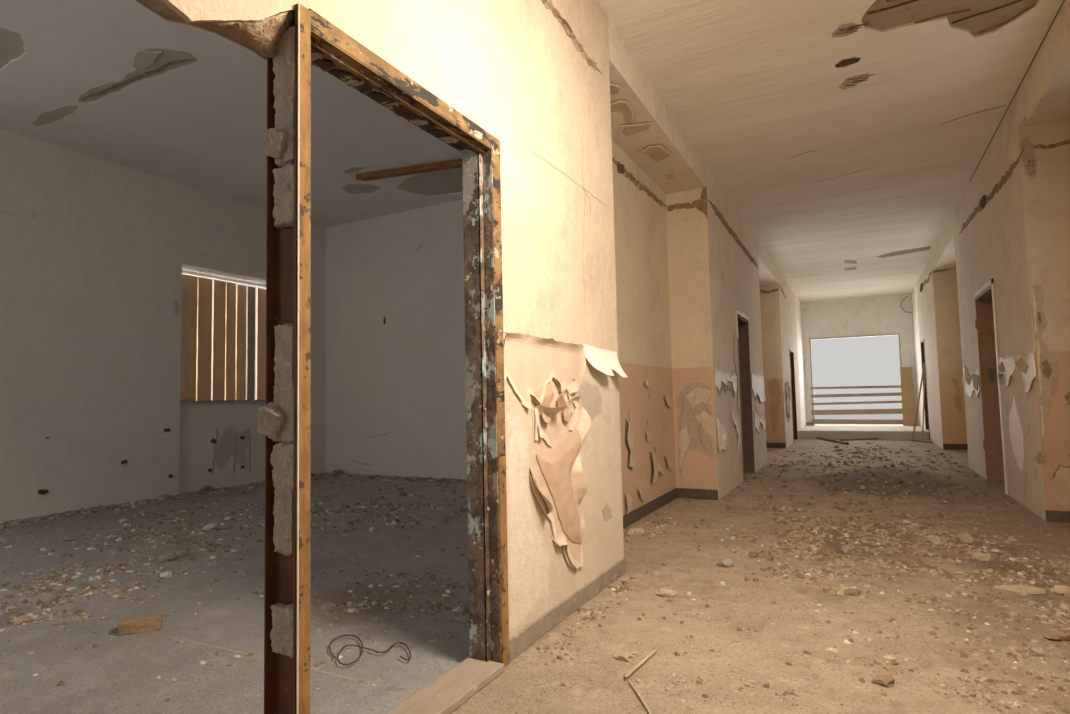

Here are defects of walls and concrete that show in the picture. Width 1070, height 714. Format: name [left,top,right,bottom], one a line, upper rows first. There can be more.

spalling [137,0,293,58]
crack [541,0,603,75]
flaking render [832,0,1039,38]
spalling [33,48,198,126]
crack [524,126,606,318]
crack [612,156,786,299]
crack [959,139,1070,234]
peeling [504,333,627,570]
peeling [602,409,673,521]
peeling [715,367,741,452]
peeling [752,372,766,433]
spalling [998,284,1058,470]